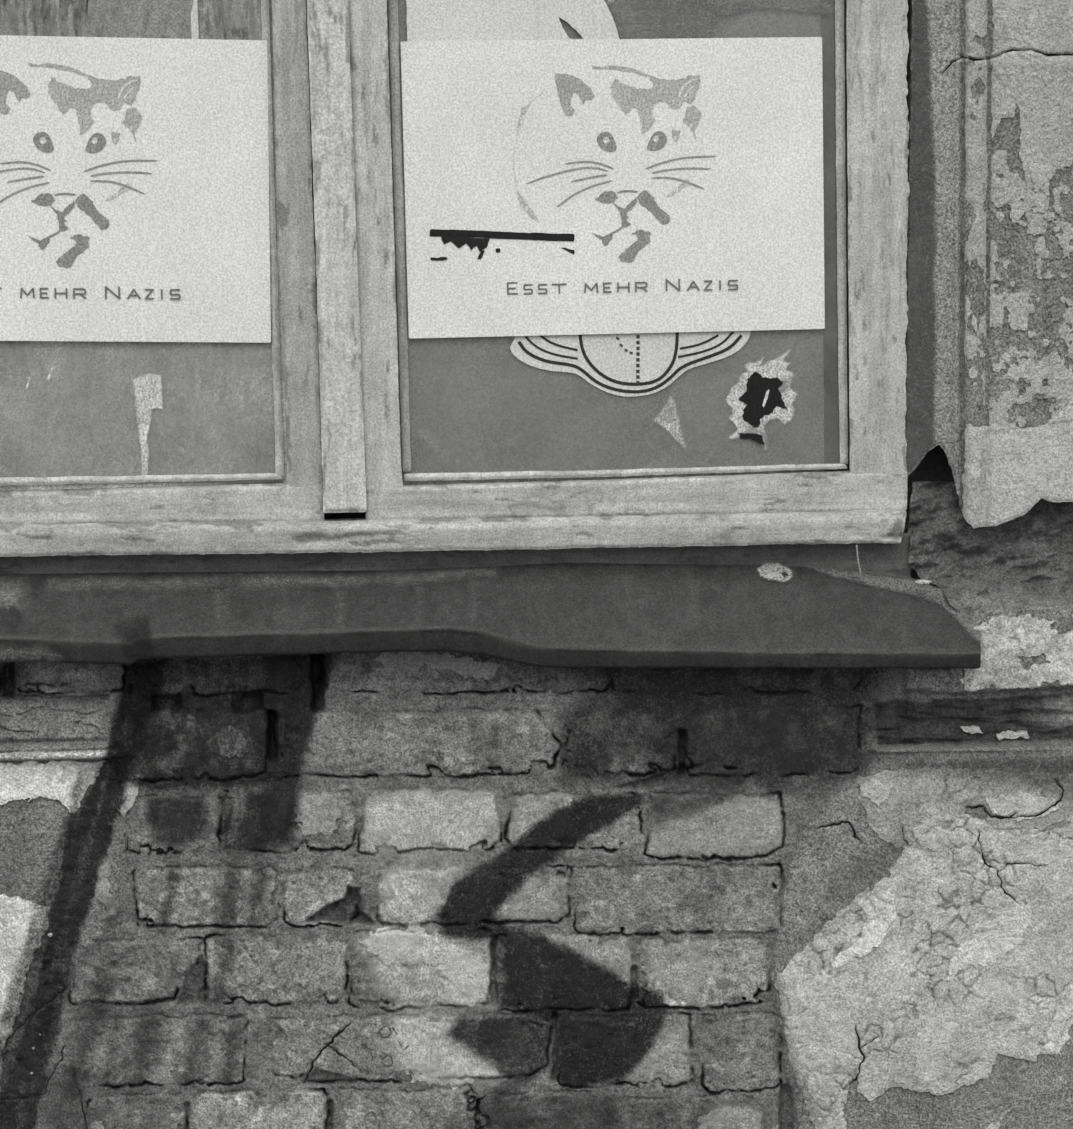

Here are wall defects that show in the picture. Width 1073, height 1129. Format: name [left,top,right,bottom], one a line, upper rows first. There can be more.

crack [942,49,1073,74]
peeling [962,0,1073,529]
crack [817,766,1073,904]
peeling [14,908,52,944]
crack [844,1027,877,1089]